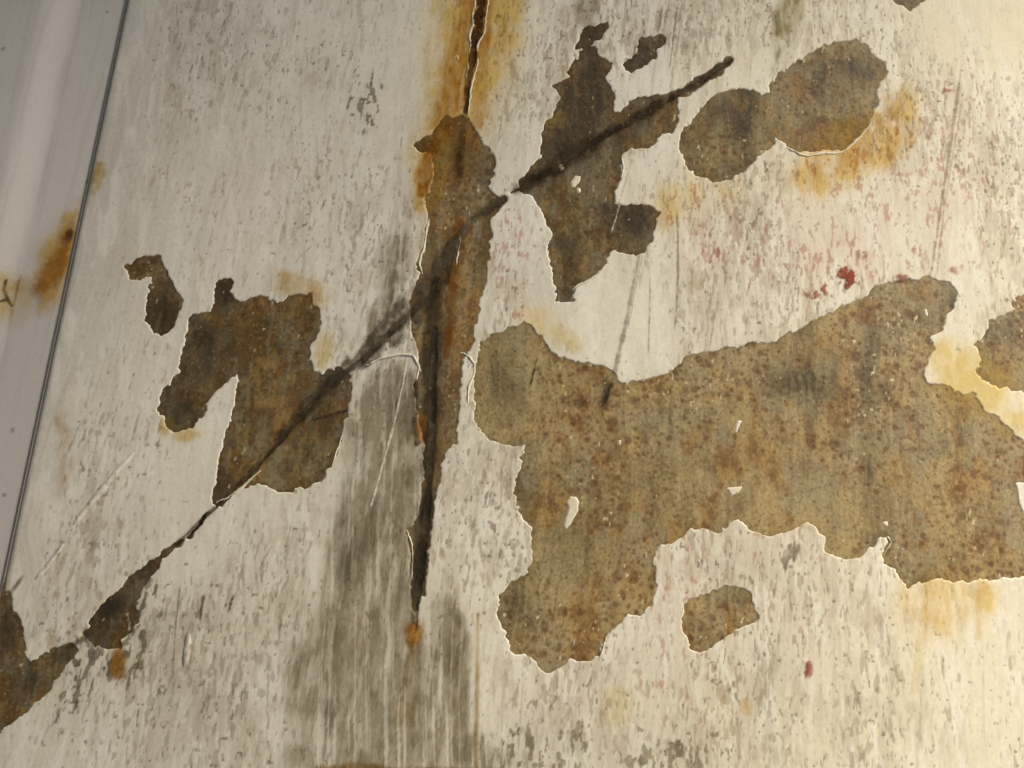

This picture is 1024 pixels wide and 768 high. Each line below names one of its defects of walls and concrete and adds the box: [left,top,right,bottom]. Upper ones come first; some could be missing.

crack [453,0,489,115]
peeling [82,255,352,650]
crack [332,113,646,604]
peeling [406,21,1024,673]
peeling [0,579,78,733]